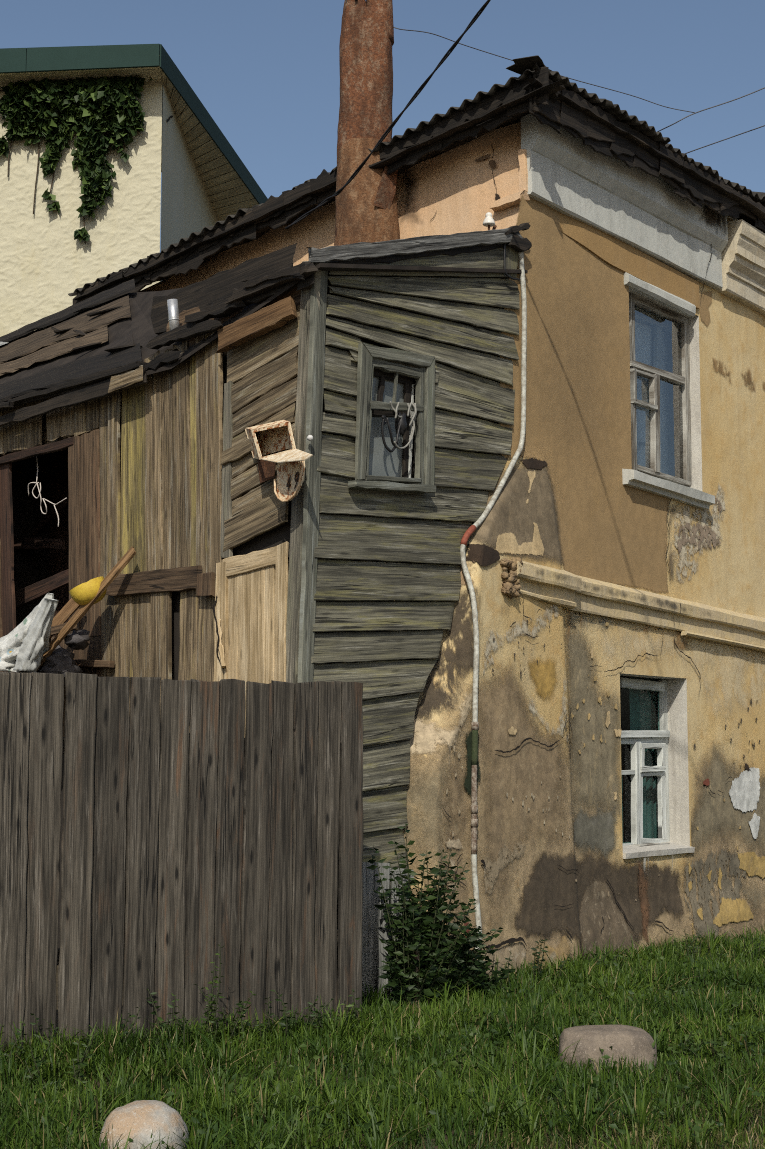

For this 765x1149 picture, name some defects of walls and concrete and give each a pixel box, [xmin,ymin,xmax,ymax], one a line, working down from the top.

peeling [449,522,544,586]
peeling [526,470,536,503]
crack [590,498,701,692]
peeling [669,485,725,583]
crack [495,687,573,759]
damp [403,588,765,970]